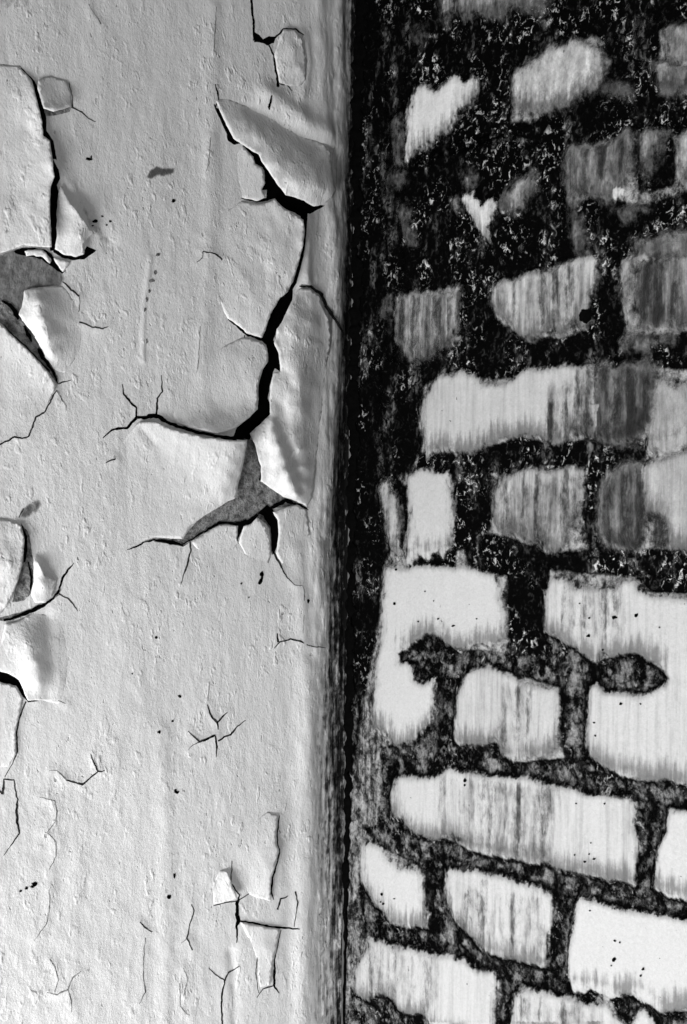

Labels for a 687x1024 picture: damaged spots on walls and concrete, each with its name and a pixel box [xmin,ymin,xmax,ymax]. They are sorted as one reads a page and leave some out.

peeling [0,64,112,404]
peeling [103,0,348,585]
crack [5,700,65,776]
peeling [0,518,78,855]
crack [181,541,192,584]
crack [188,705,246,757]